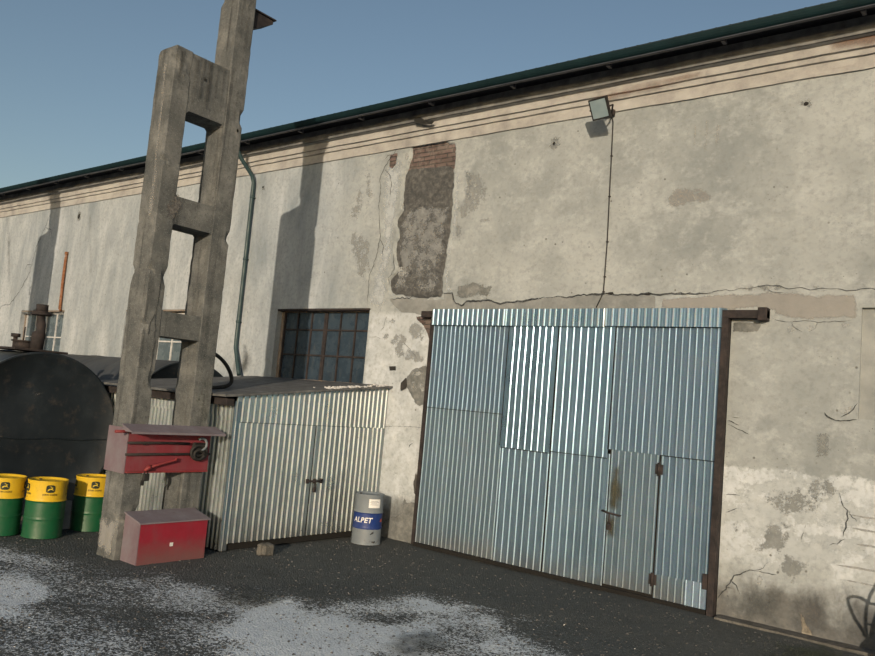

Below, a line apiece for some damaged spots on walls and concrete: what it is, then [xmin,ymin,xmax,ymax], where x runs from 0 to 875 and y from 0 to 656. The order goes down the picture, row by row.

crack [367,152,395,300]
flaking render [351,142,707,405]
crack [656,285,874,296]
crack [824,404,857,421]
peeling [767,480,836,513]
crack [830,493,857,545]
peeling [755,524,806,583]
crack [717,561,776,599]